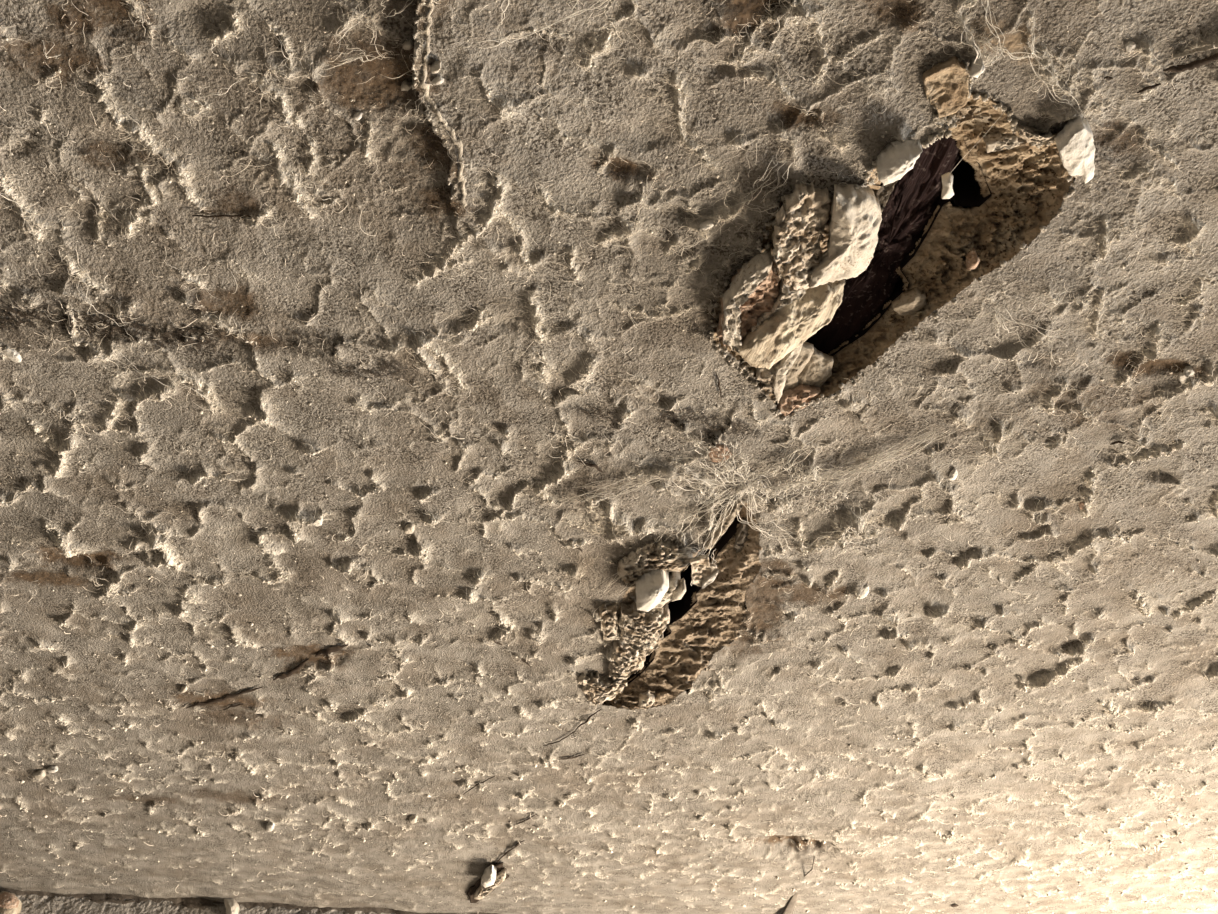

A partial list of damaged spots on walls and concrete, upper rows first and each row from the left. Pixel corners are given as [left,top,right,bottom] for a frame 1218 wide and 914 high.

spalling [707,55,1096,421]
spalling [578,496,762,710]